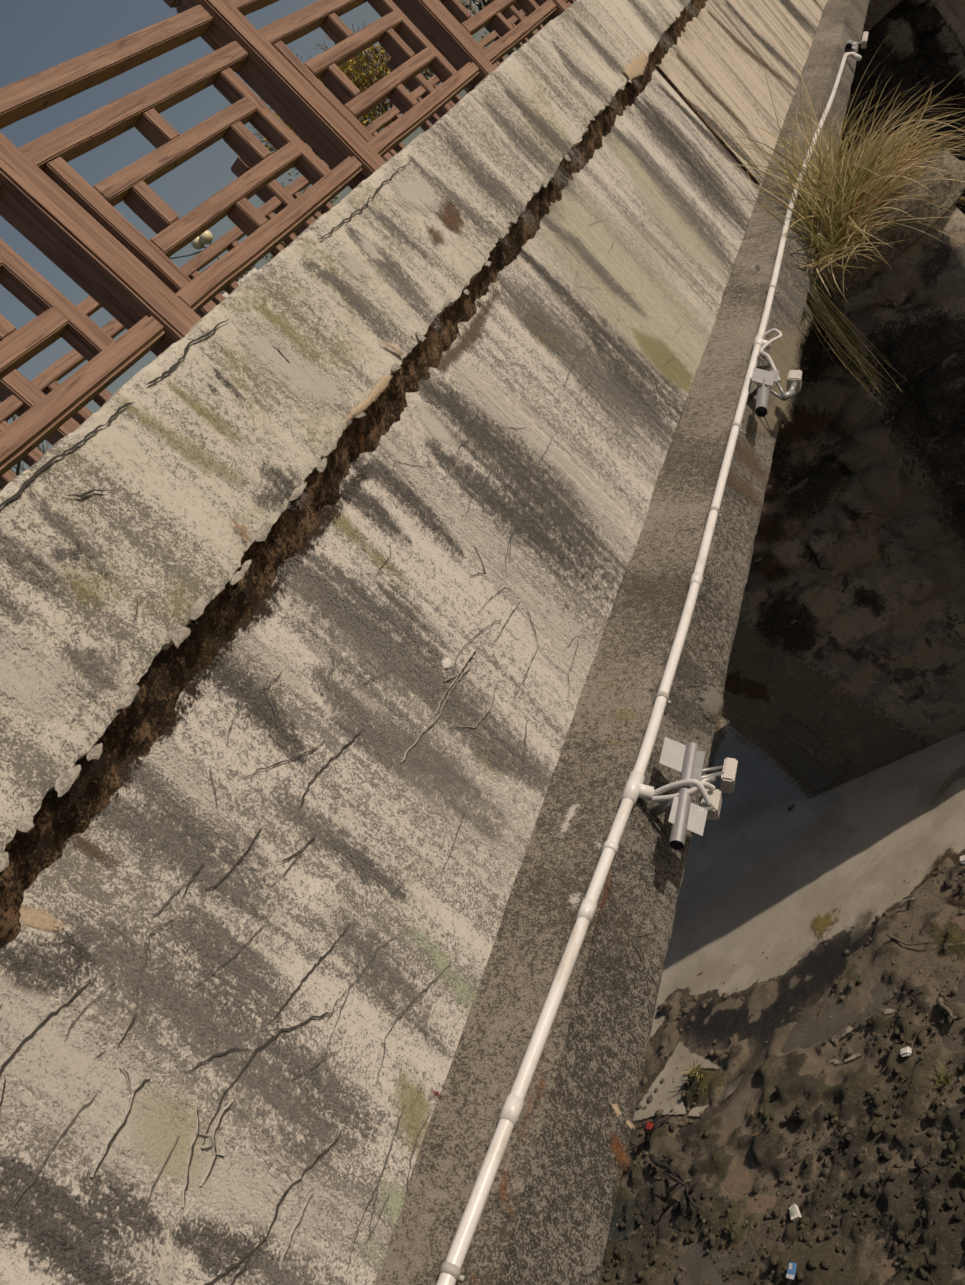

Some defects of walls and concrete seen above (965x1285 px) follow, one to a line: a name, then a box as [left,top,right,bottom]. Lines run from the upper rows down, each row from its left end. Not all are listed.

crack [0,319,228,507]
crack [0,826,316,1205]
damp [0,737,406,1285]
crack [144,923,400,1225]
crack [245,729,363,807]
damp [200,546,553,874]
damp [346,205,442,329]
crack [392,425,586,762]
damp [339,345,644,695]
peeling [557,803,580,837]
damp [409,0,765,467]
damp [637,849,965,1104]